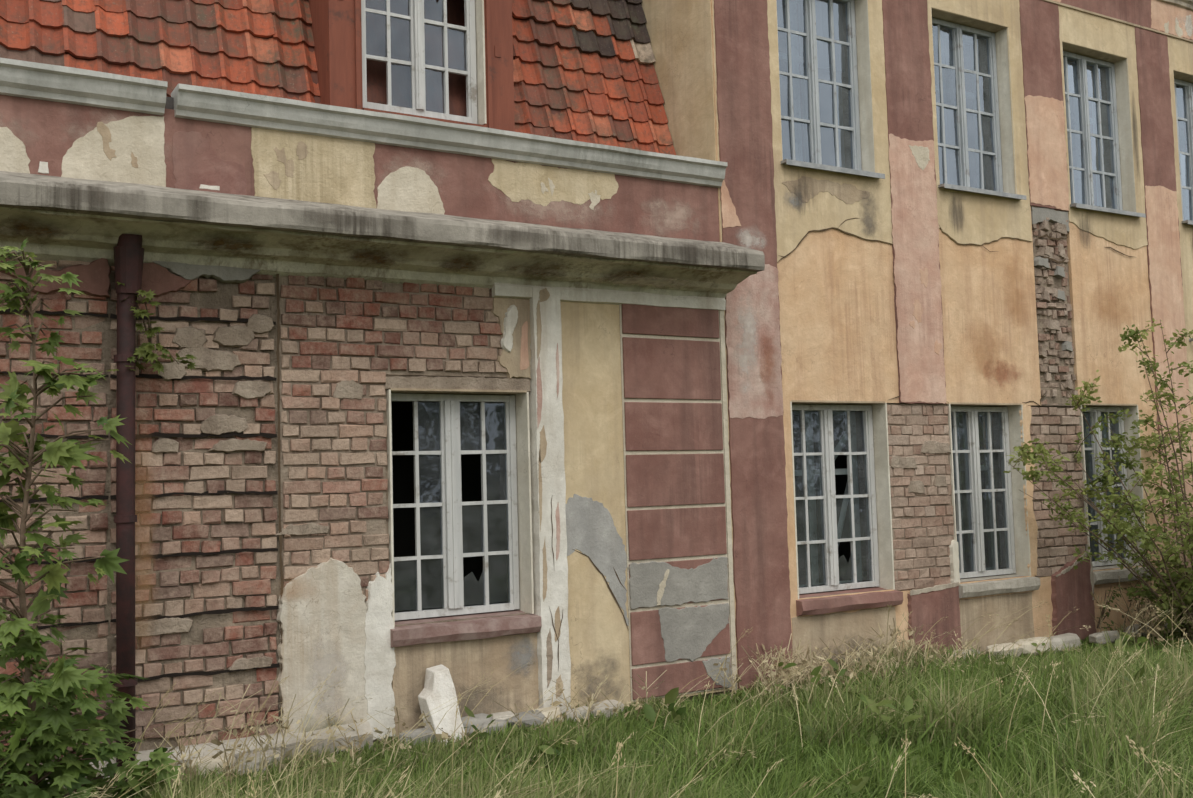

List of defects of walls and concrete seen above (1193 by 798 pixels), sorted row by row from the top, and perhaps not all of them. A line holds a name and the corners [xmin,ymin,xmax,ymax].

flaking render [0,116,445,214]
flaking render [488,158,619,210]
crack [778,218,891,262]
crack [939,225,1028,252]
flaking render [135,274,563,747]
flaking render [629,557,732,688]